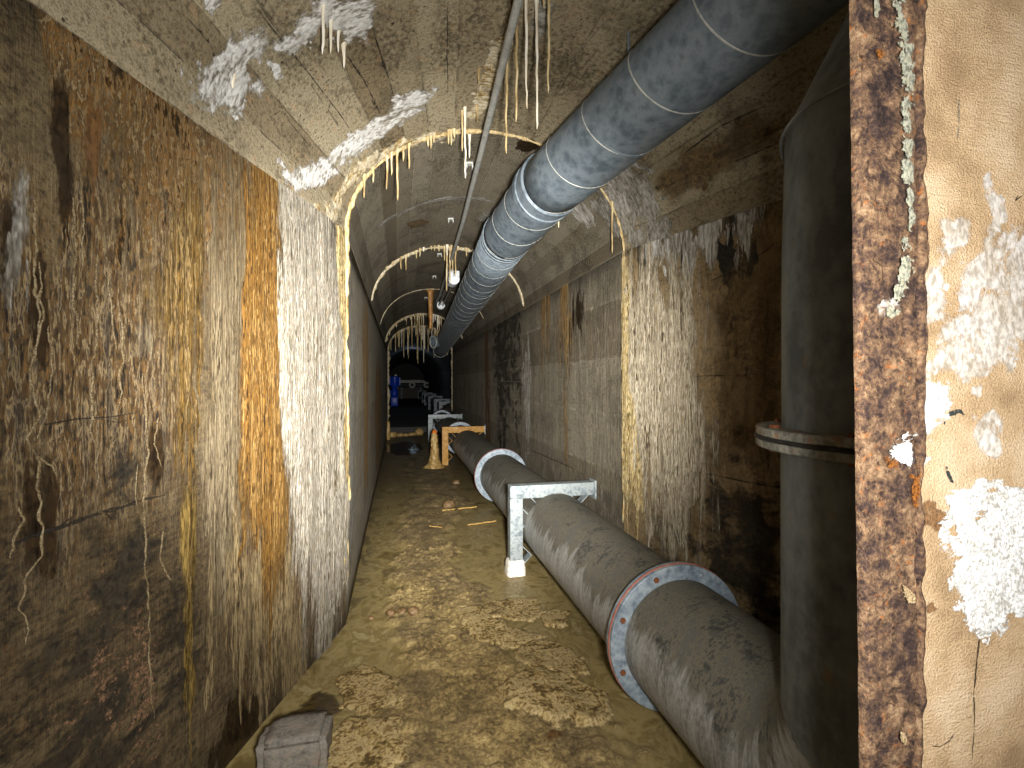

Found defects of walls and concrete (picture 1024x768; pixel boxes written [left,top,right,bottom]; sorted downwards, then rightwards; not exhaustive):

leakage [0,176,58,644]
leakage [51,76,125,484]
crack [11,495,165,545]
crack [44,412,138,425]
leakage [135,373,165,717]
efflorescence [181,0,377,120]
leakage [200,36,515,768]
leakage [516,139,539,154]
leakage [571,163,766,566]